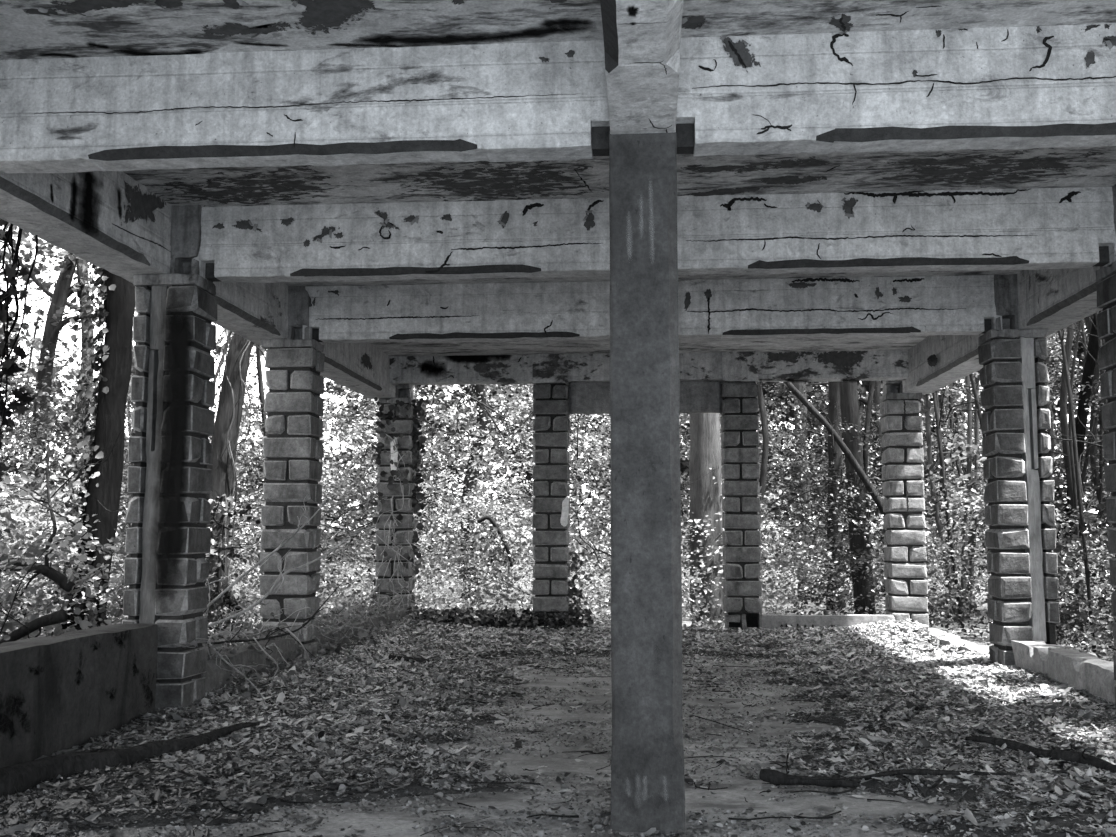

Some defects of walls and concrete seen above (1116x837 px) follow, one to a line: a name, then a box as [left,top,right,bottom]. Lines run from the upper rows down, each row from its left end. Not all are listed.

crack [876,6,940,22]
crack [692,26,1116,105]
crack [755,115,792,160]
crack [522,203,544,216]
crack [1059,191,1081,203]
crack [425,230,601,273]
crack [686,165,1038,334]